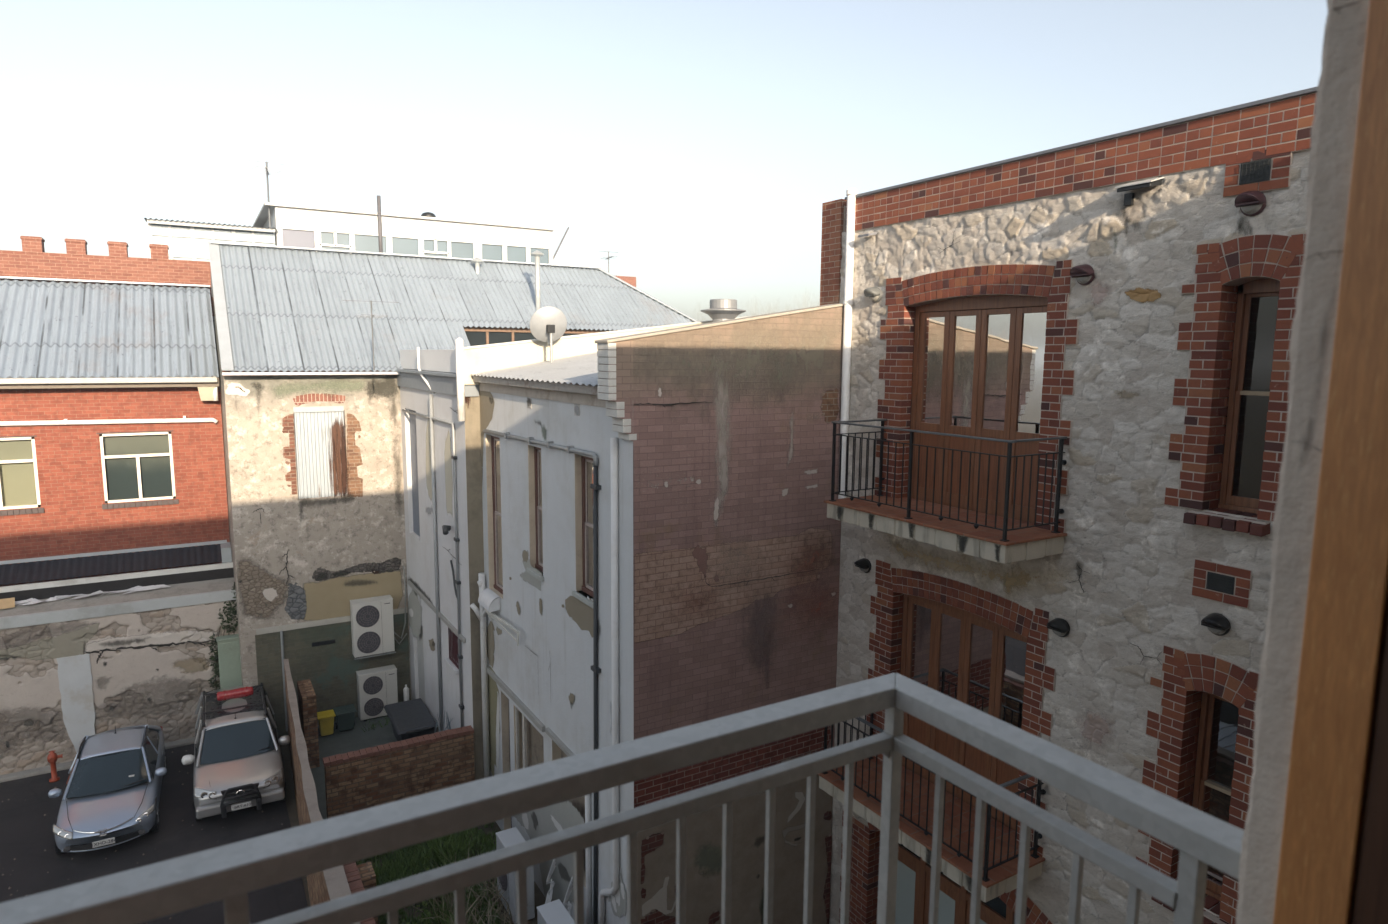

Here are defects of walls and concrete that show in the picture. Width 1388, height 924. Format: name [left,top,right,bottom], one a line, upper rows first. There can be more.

flaking render [237,558,402,620]